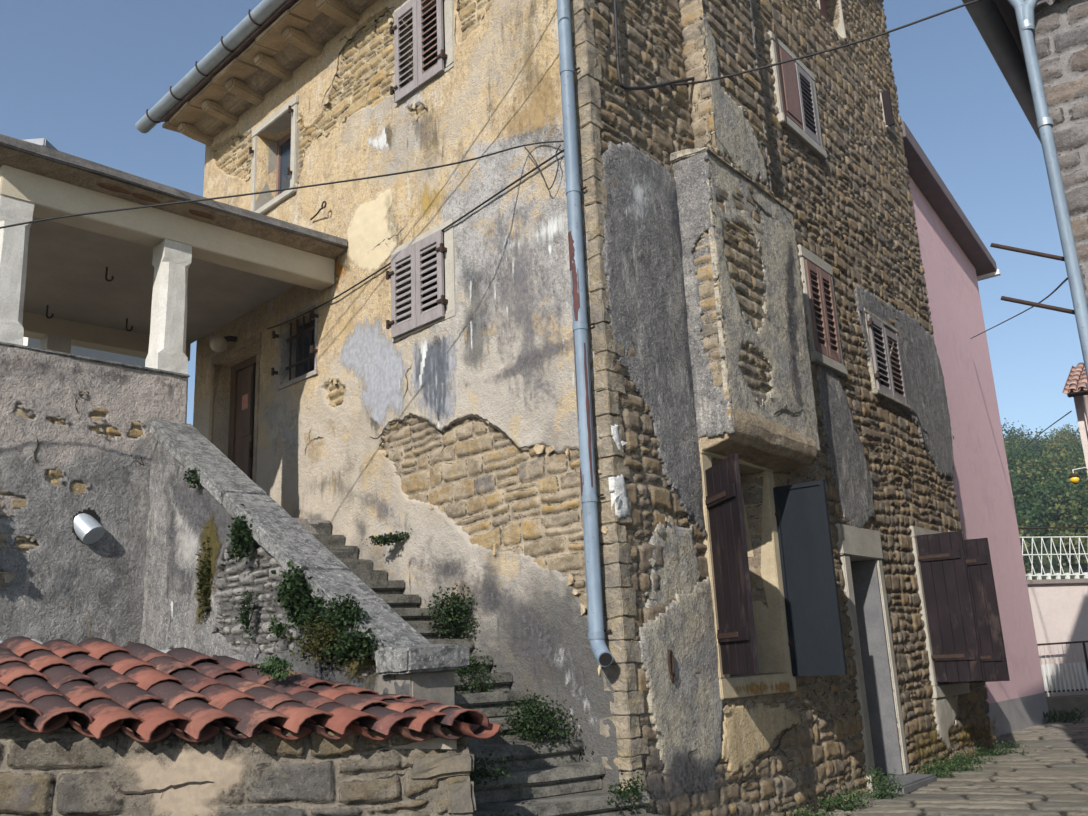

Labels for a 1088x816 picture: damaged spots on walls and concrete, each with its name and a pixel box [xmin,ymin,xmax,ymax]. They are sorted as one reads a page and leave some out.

spalling [458,0,494,42]
spalling [295,9,395,187]
rust [568,231,580,324]
leakage [481,215,568,392]
leakage [419,339,428,386]
spalling [325,378,345,408]
spalling [340,319,588,621]
spalling [0,490,26,519]
peeling [595,458,631,566]
spalling [13,535,39,553]
crack [117,781,212,799]